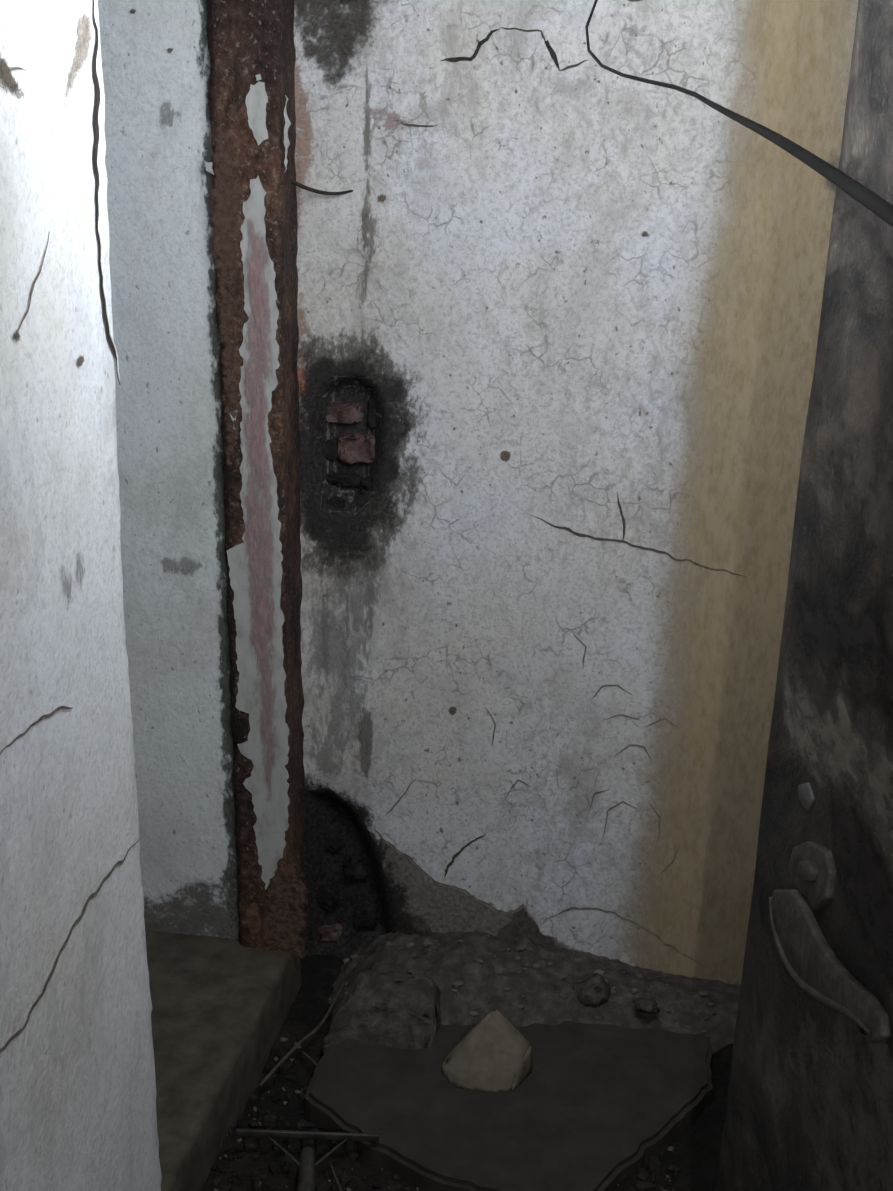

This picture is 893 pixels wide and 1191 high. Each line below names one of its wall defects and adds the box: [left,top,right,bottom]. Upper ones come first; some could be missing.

crack [441,27,587,71]
crack [93,0,120,384]
rust [294,63,314,219]
rust [210,122,243,466]
rust [297,304,310,441]
spalling [309,371,386,515]
crack [532,492,745,577]
crack [0,706,73,755]
crack [0,837,141,1053]
rust [262,854,307,958]